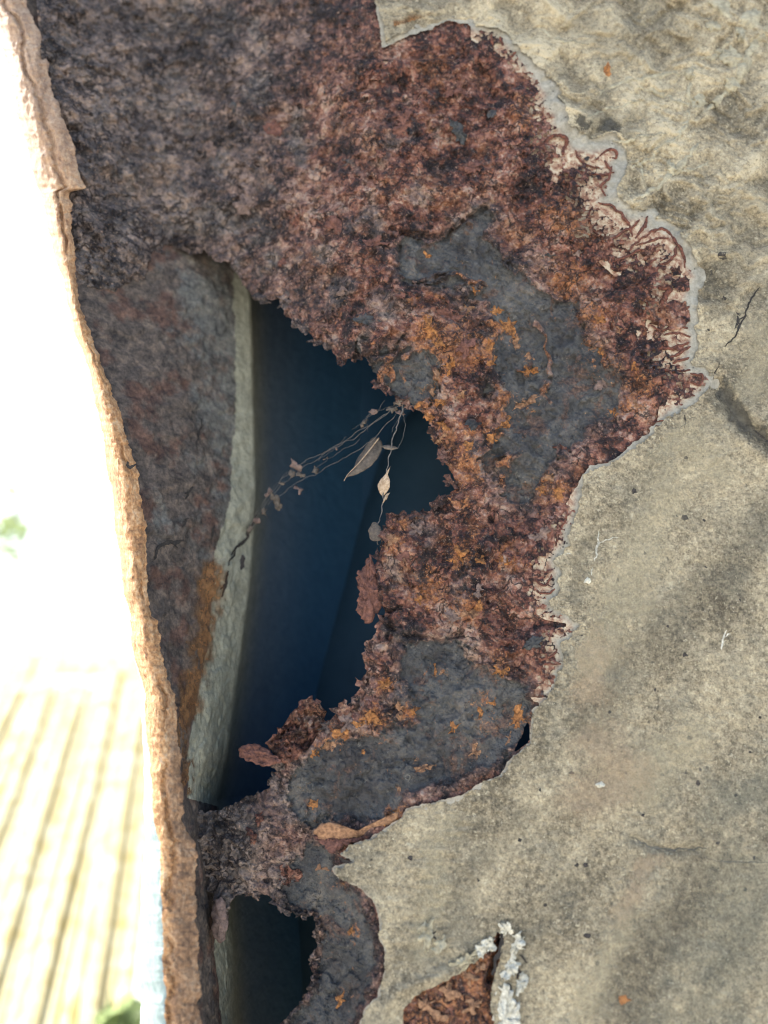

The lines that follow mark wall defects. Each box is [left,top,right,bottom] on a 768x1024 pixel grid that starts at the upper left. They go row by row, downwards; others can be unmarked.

peeling [598,202,633,237]
peeling [664,273,690,292]
peeling [0,0,202,1024]
spalling [315,356,455,721]
rust [355,554,382,624]
rust [177,562,224,795]
rust [239,695,327,767]
spalling [514,723,530,751]
rust [312,812,398,854]
rust [211,897,228,943]
spalling [298,916,317,997]
spalling [403,919,529,1024]